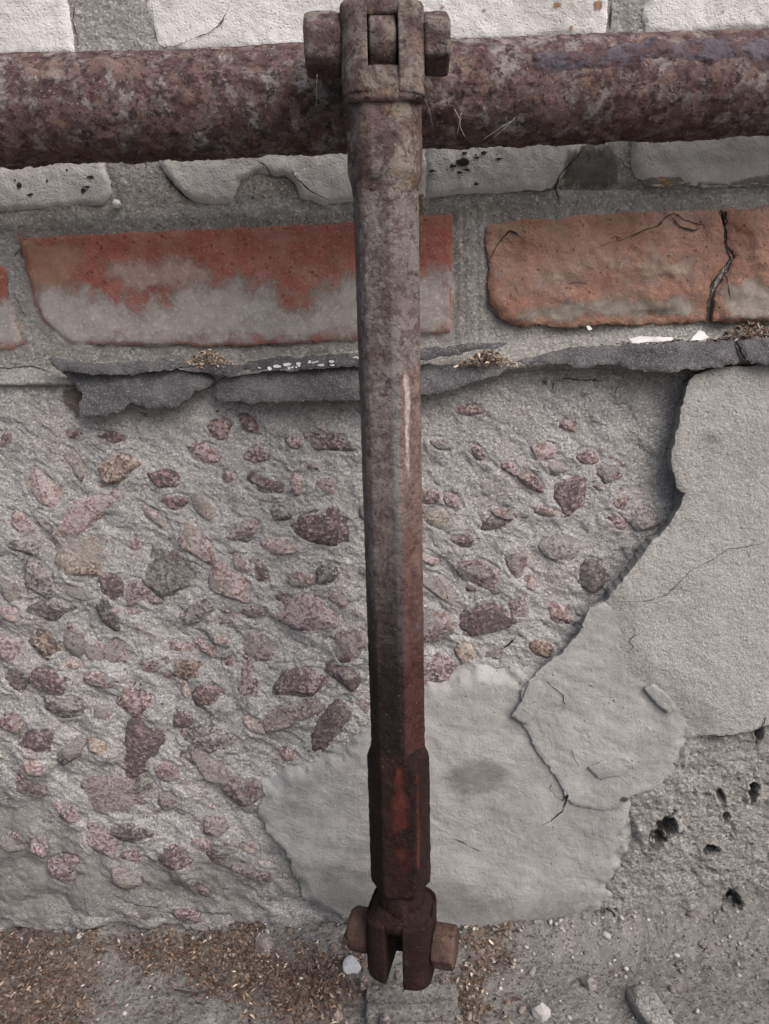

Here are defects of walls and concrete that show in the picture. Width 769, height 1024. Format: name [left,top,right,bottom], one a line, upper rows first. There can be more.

crack [554,146,590,206]
crack [594,211,732,321]
spalling [0,385,376,933]
spalling [421,369,769,929]
crack [543,782,568,825]